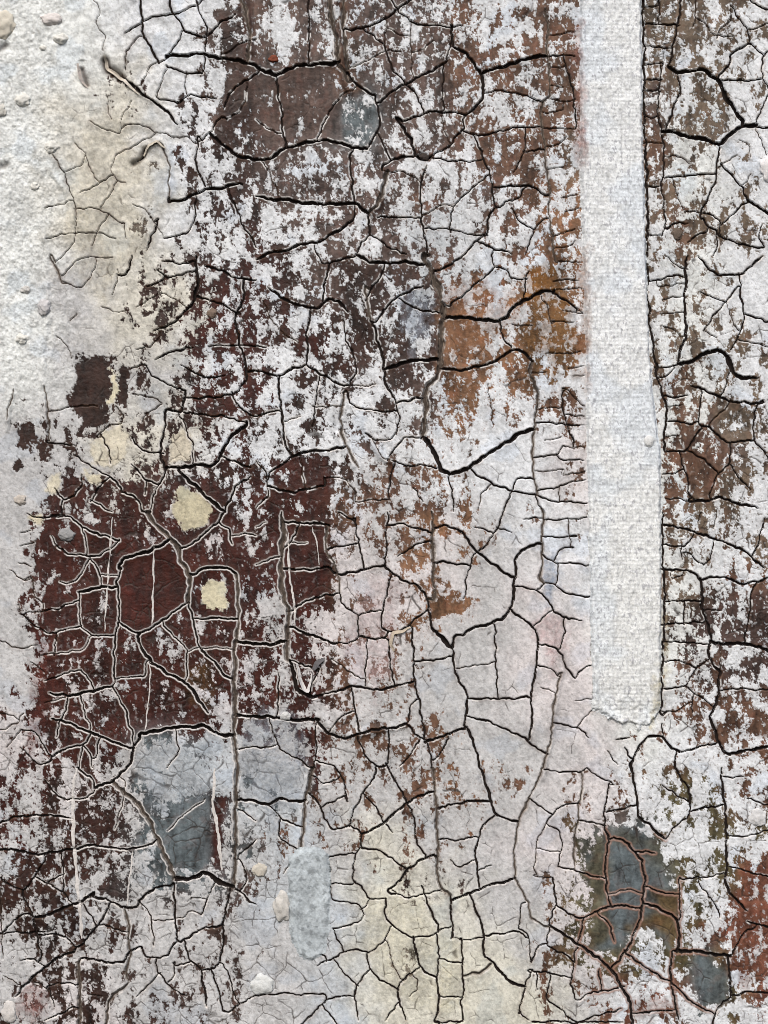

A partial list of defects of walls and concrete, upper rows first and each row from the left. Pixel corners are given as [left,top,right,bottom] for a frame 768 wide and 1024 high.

peeling [213,0,578,203]
peeling [644,0,730,140]
peeling [60,355,132,451]
peeling [187,254,260,432]
crack [19,0,587,733]
peeling [339,264,492,412]
crack [641,0,768,508]
peeling [0,453,336,933]
crack [0,696,348,1024]
crack [286,505,768,1024]
peeling [691,855,768,1008]
peeling [710,588,768,739]